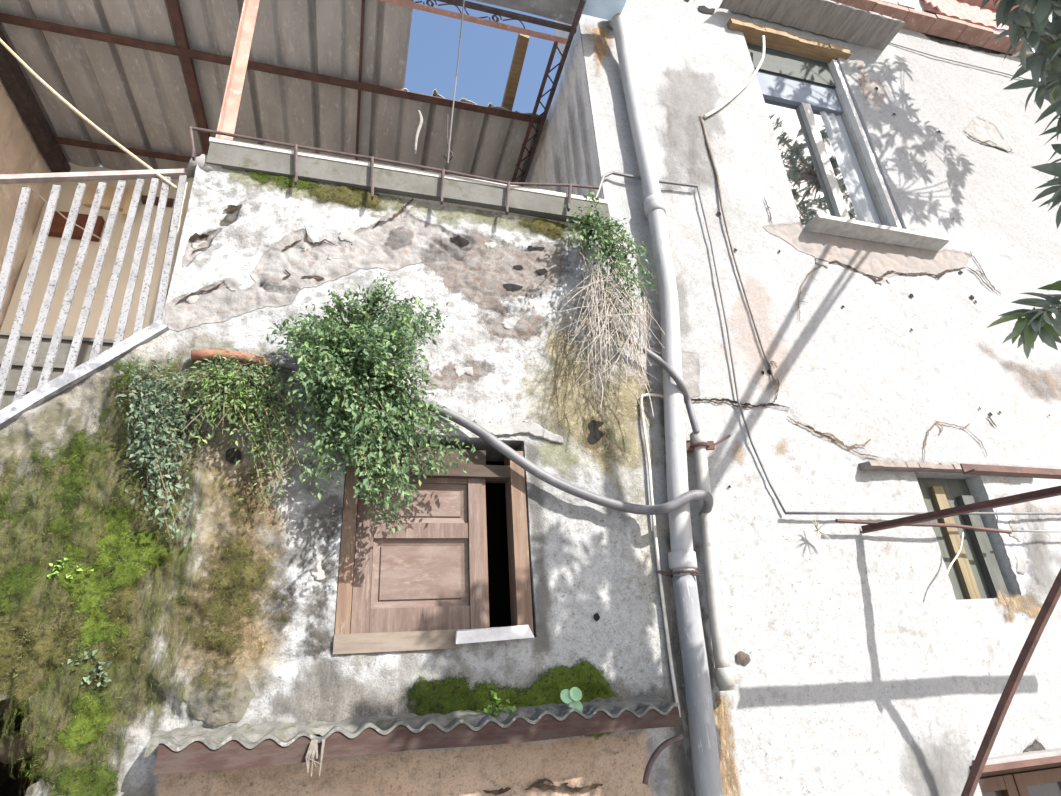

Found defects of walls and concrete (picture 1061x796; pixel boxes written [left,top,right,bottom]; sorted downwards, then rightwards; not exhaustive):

spalling [164,200,570,343]
spalling [762,222,971,285]
crack [798,251,1001,321]
crack [691,378,879,458]
leakage [191,467,283,677]
leakage [273,660,417,723]